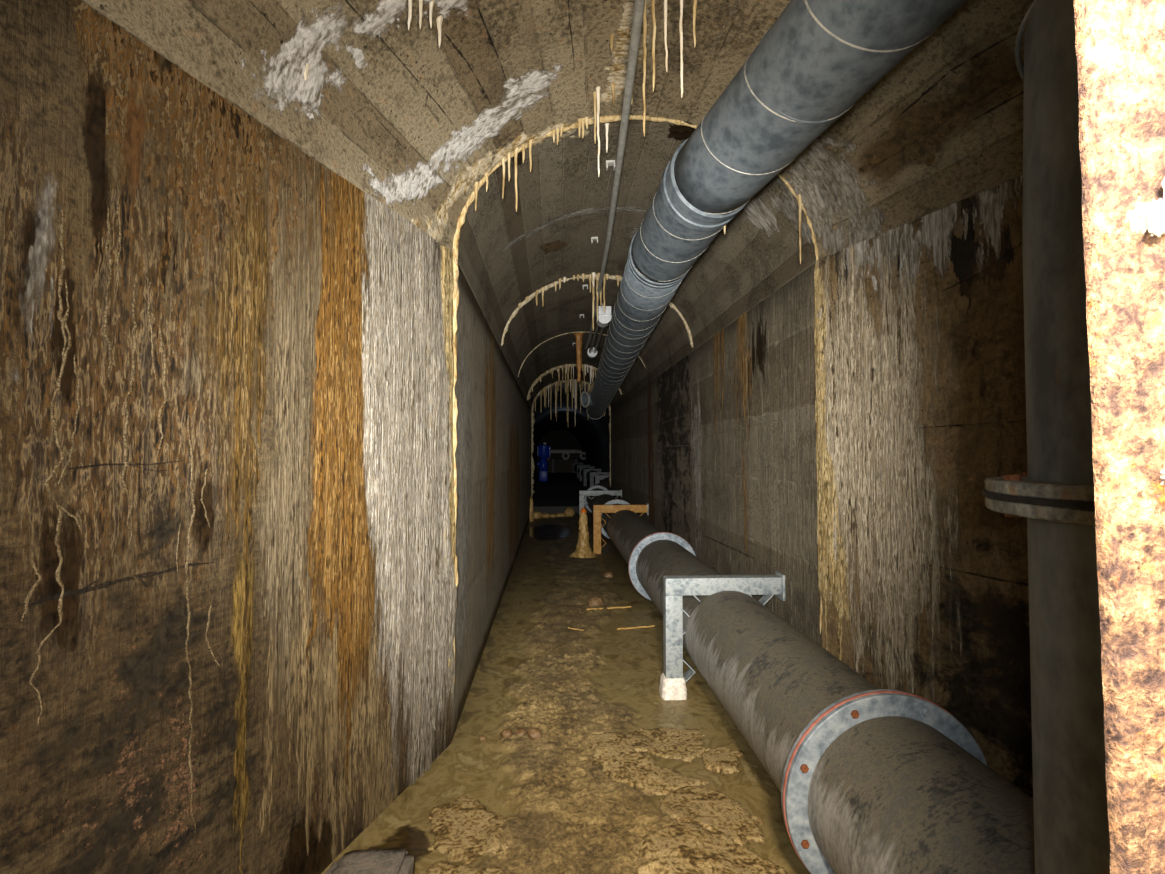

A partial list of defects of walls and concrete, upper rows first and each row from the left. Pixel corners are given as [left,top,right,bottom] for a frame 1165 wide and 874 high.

damp [15,183,82,726]
damp [84,70,122,381]
crack [23,562,213,607]
crack [67,461,178,472]
damp [121,282,167,543]
damp [176,414,214,830]
efflorescence [242,0,406,119]
damp [259,65,623,874]
efflorescence [422,0,467,18]
damp [668,302,693,348]
damp [668,122,695,143]
damp [742,137,1023,694]